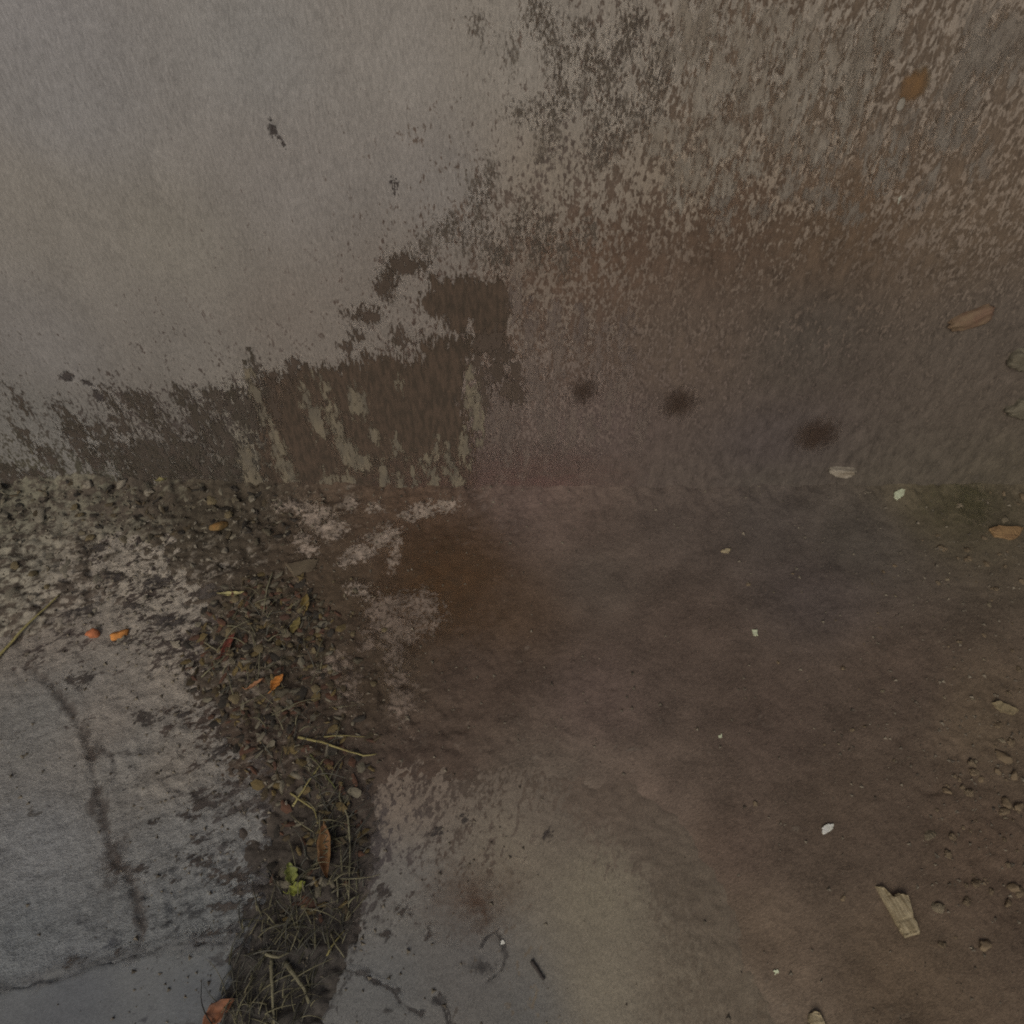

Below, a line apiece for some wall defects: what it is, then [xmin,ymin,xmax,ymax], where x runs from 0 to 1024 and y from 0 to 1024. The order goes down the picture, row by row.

damp [248,245,527,575]